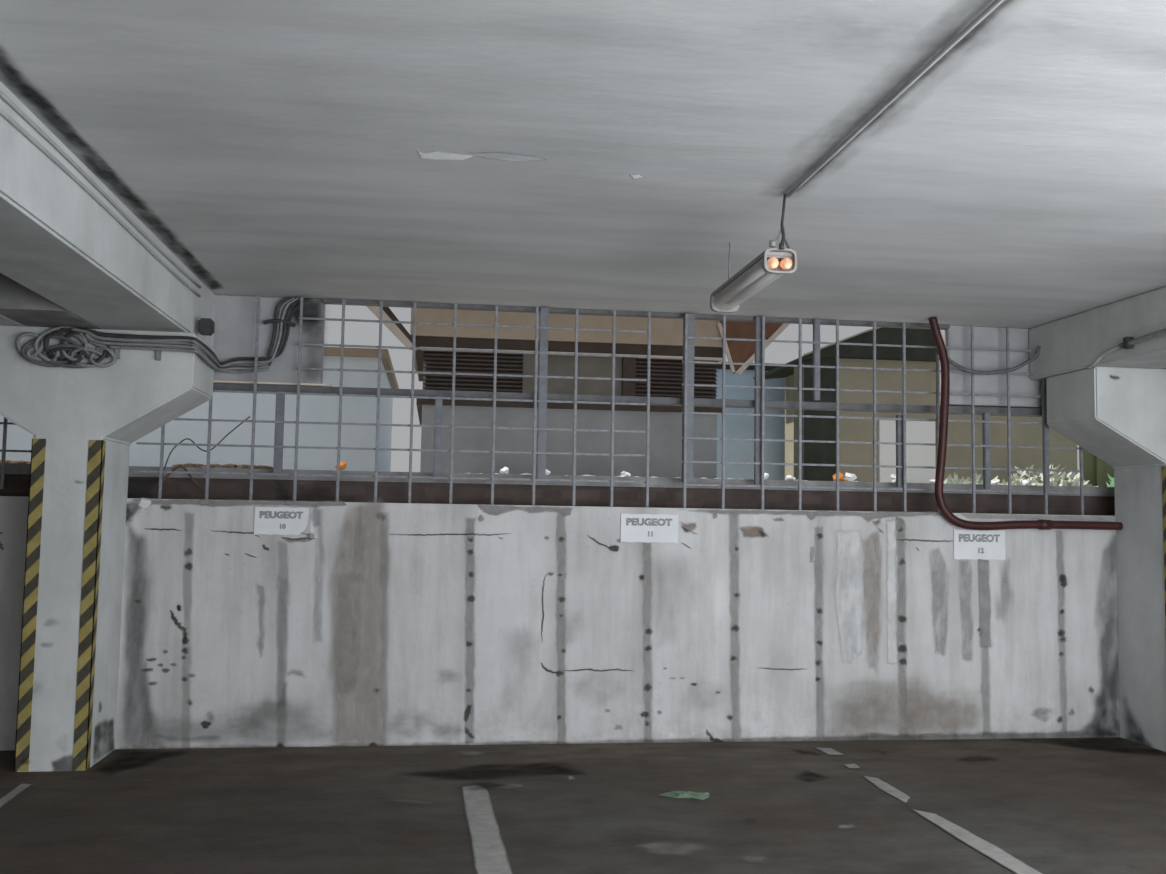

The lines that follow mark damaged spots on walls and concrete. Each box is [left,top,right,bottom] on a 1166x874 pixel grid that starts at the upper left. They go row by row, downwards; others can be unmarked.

damp [334,518,387,741]
damp [864,534,880,652]
damp [932,560,947,654]
damp [961,560,1008,647]
damp [1087,599,1120,736]